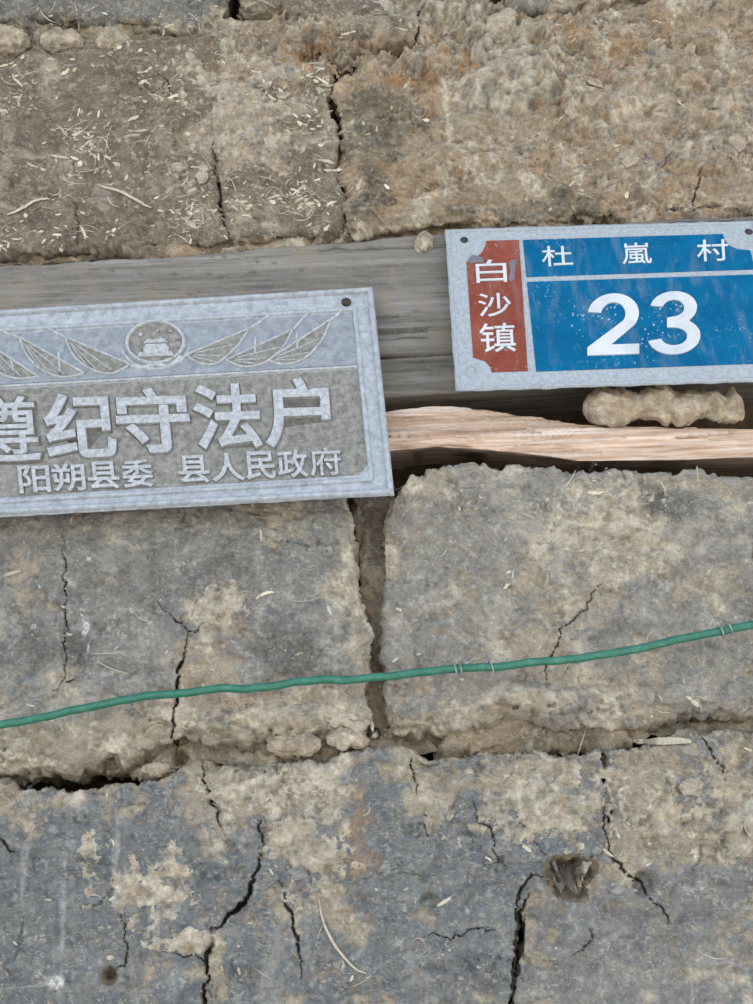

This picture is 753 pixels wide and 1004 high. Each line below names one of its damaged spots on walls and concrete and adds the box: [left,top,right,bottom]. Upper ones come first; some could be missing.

crack [53,537,73,691]
crack [158,602,205,754]
crack [544,584,601,681]
crack [201,765,221,826]
crack [161,820,302,1004]
crack [602,782,670,923]